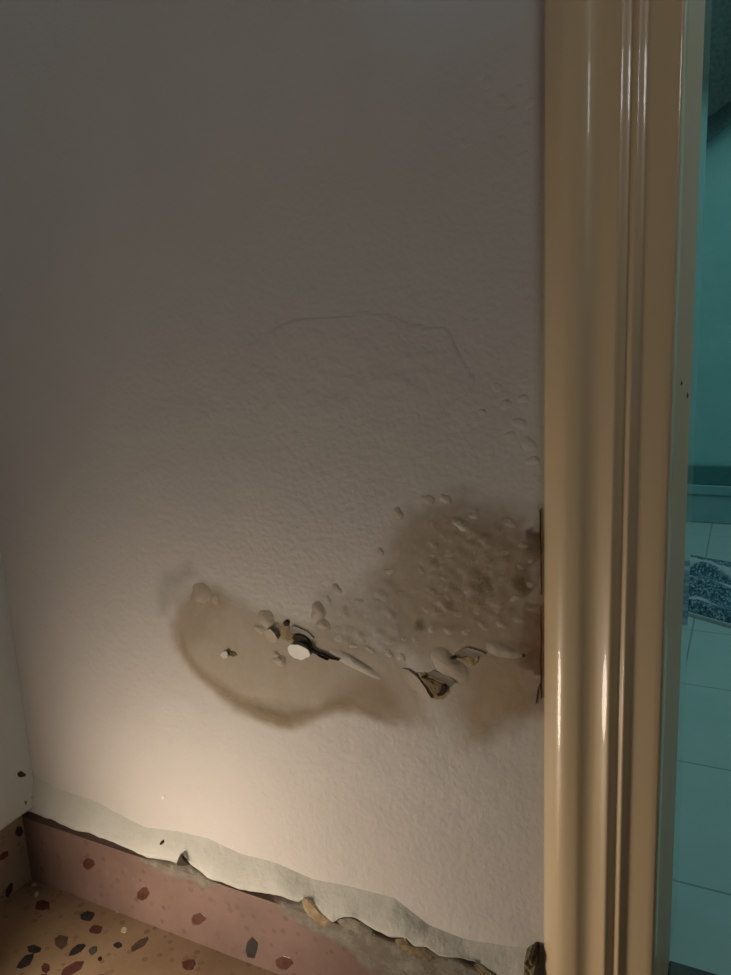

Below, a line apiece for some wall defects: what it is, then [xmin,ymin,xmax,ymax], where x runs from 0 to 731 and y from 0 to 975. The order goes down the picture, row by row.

peeling [264,620,314,660]
water stain [179,595,413,725]
spalling [402,668,455,700]
water stain [387,515,525,729]
spalling [281,898,493,975]
spalling [524,941,540,975]